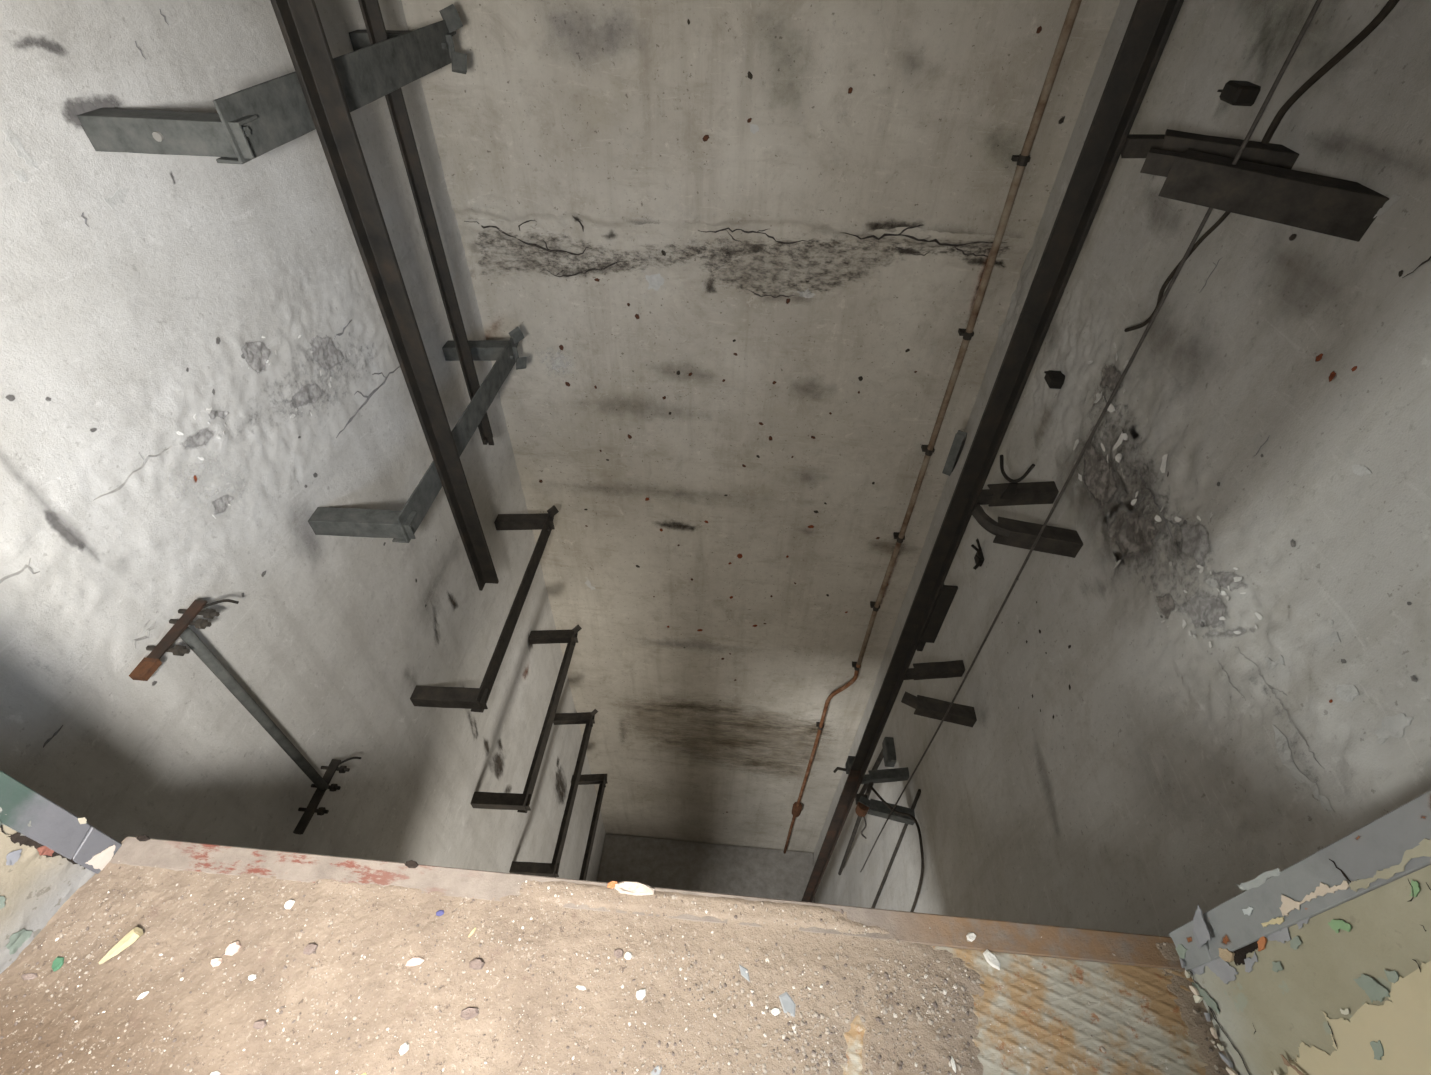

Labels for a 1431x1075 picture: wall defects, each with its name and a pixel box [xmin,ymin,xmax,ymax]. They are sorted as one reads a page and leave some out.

crack [464,216,626,277]
crack [698,227,812,244]
crack [845,225,1007,267]
spalling [241,336,277,373]
spalling [290,335,354,418]
spalling [1087,342,1129,422]
spalling [177,389,228,460]
spalling [206,489,233,519]
spalling [1150,513,1263,648]
peeling [52,956,64,972]
peeling [1271,961,1431,1075]